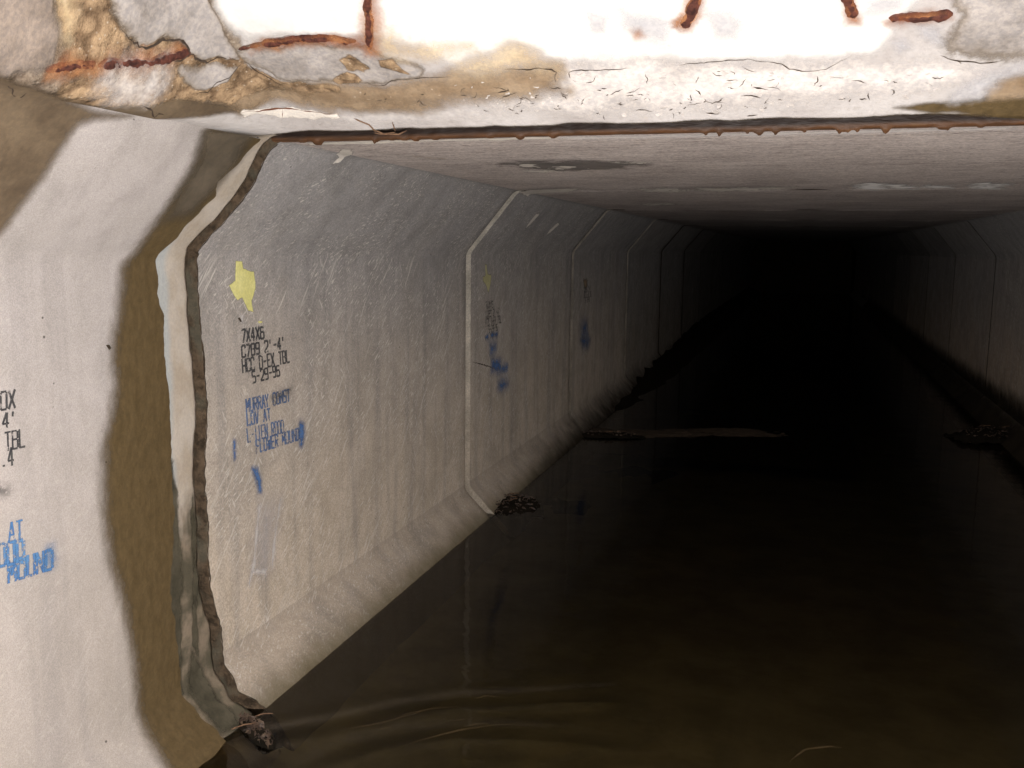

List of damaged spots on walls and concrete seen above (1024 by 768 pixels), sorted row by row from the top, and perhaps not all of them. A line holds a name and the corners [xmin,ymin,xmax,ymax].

rust [260,0,397,55]
rust [674,0,702,29]
spalling [0,0,794,120]
crack [679,57,849,76]
leakage [0,0,1024,233]
rust [271,114,1024,145]